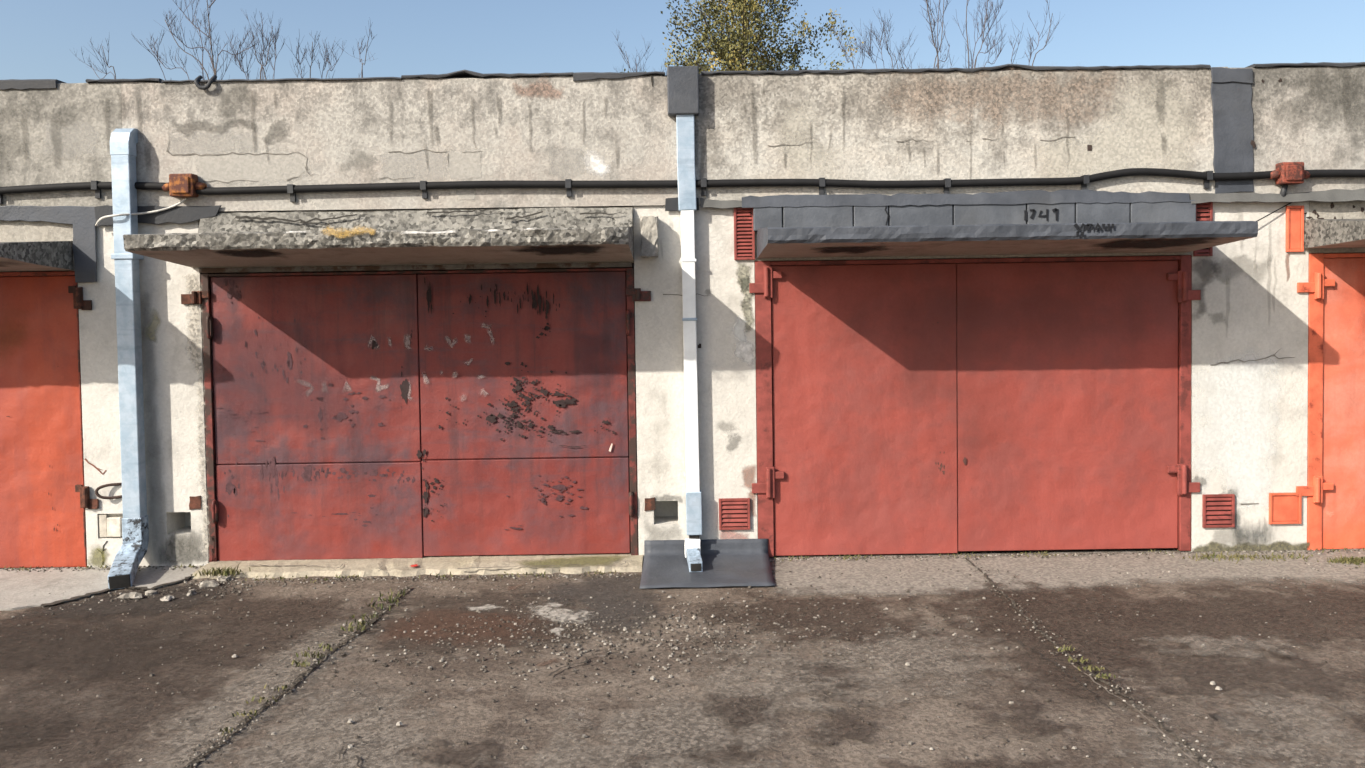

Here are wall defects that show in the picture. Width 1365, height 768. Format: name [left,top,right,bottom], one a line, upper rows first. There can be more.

damp [515,82,560,97]
peeling [452,283,560,338]
crack [1211,348,1295,366]
peeling [438,362,616,447]